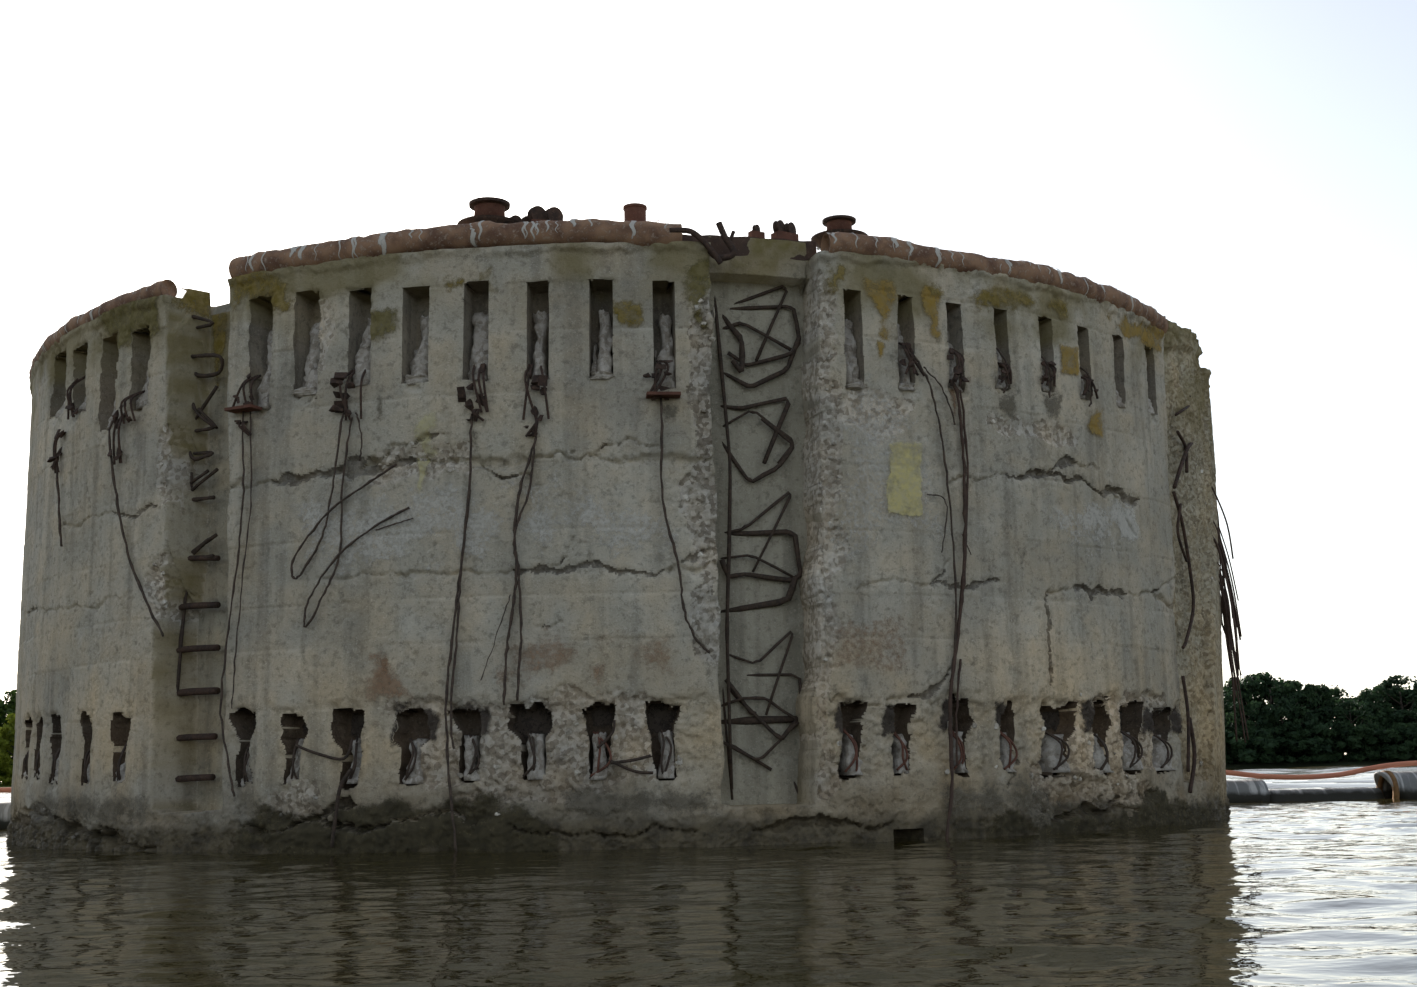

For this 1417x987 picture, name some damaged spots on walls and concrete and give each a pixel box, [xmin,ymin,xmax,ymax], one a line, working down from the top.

crack [271,432,439,487]
crack [492,470,519,480]
spalling [675,297,721,664]
crack [1005,454,1140,508]
spalling [799,269,915,800]
crack [513,549,705,577]
crack [929,569,1000,591]
spalling [986,344,1217,825]
spalling [24,746,61,781]
spalling [116,742,127,781]
spalling [383,682,683,826]
spalling [262,737,358,848]